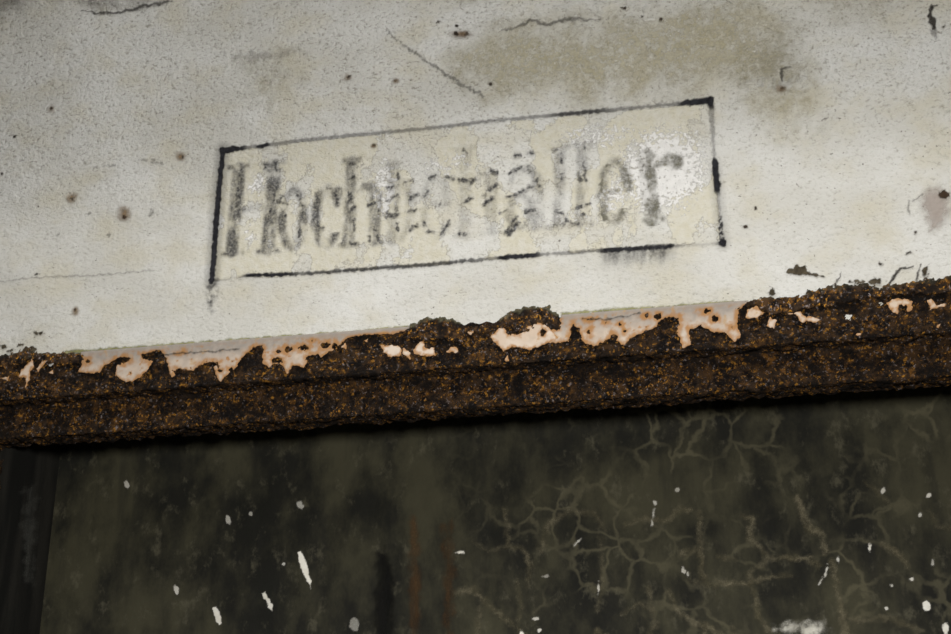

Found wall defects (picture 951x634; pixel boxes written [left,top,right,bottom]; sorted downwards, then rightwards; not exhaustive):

crack [927,4,938,29]
damp [462,9,788,90]
corrosion [407,305,561,344]
peeling [490,300,777,361]
peeling [789,312,819,323]
corrosion [737,275,951,316]
peeling [886,298,913,314]
peeling [0,343,53,388]
corrosion [0,346,84,369]
peeling [78,326,458,382]